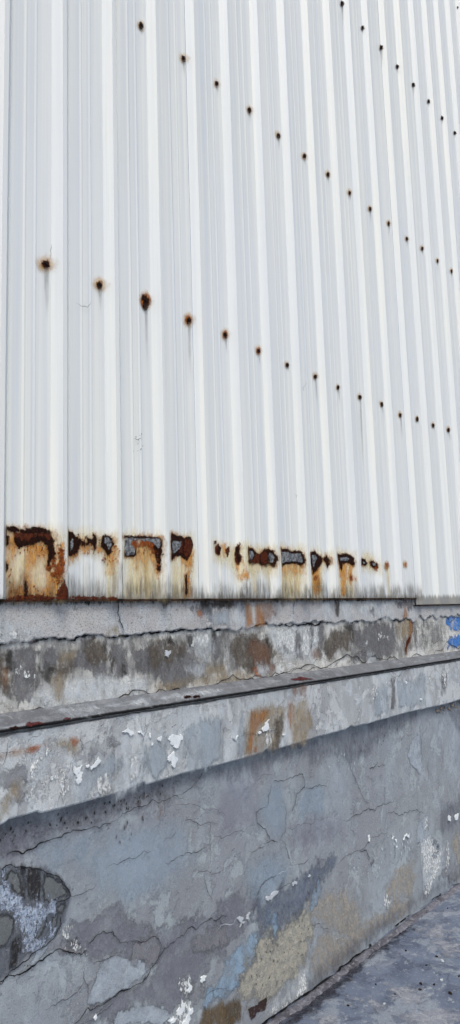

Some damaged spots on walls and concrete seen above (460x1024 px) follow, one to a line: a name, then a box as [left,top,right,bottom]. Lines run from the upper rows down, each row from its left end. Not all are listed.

corrosion [141,294,151,311]
corrosion [6,526,194,602]
corrosion [214,541,389,596]
damp [0,598,440,708]
corrosion [246,703,311,753]
peeling [0,728,183,844]
damp [87,750,143,797]
crack [0,598,460,1024]